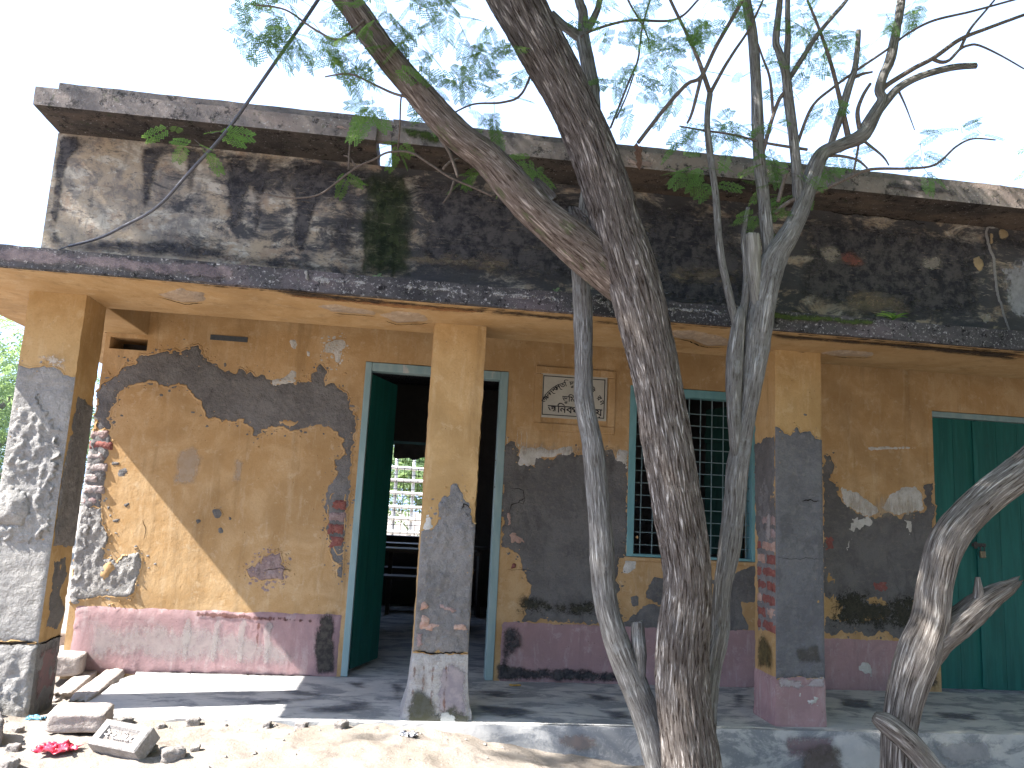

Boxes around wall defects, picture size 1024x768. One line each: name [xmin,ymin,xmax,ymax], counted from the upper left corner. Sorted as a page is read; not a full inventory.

water stain [50,137,82,242]
water stain [84,240,230,259]
water stain [220,155,365,274]
water stain [643,206,743,307]
flaking render [0,331,361,717]
water stain [315,614,334,673]
flaking render [413,475,476,655]
flaking render [494,437,599,626]
water stain [480,628,617,716]
flaking render [604,446,663,628]
flaking render [730,414,937,680]
water stain [830,589,914,629]